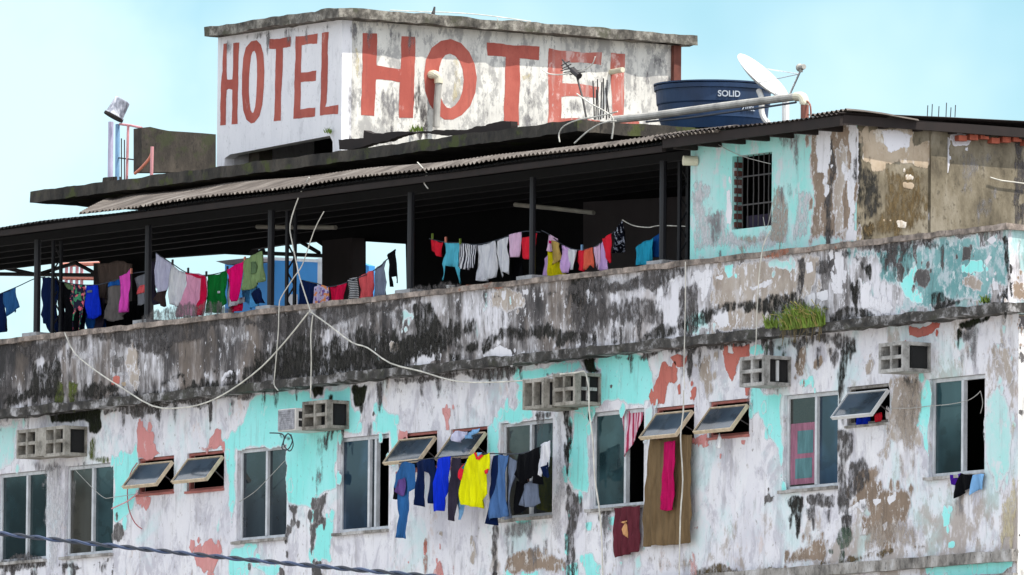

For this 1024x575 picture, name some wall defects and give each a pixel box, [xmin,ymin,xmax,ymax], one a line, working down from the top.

damp [1014,142,1024,224]
damp [0,133,948,430]
peeling [483,124,1024,516]
mould [931,292,971,310]
damp [995,231,1013,323]
peeling [110,419,160,542]
peeling [189,386,408,575]
damp [788,420,869,538]
damp [681,558,734,574]
damp [820,520,920,565]